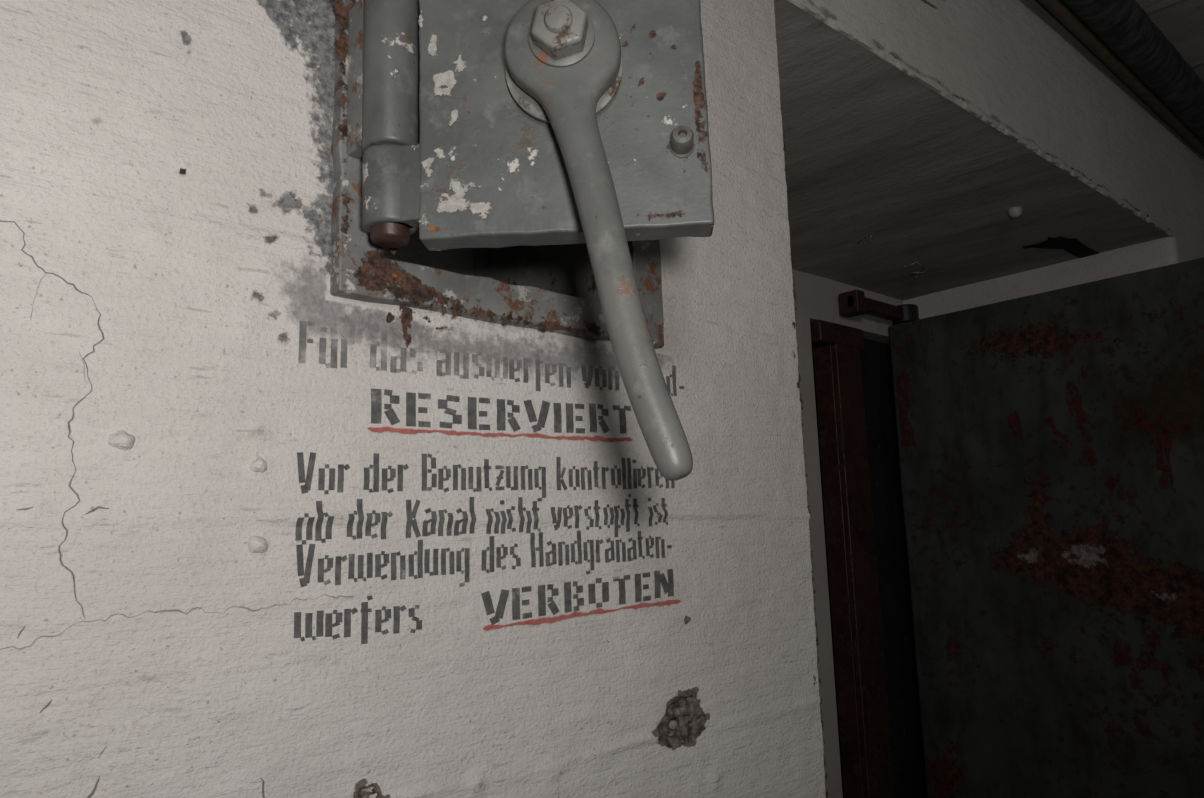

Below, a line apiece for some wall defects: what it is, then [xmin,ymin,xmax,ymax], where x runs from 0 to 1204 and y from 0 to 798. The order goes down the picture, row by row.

rust [332,0,356,139]
peeling [249,189,316,220]
rust [341,192,352,237]
crack [0,220,104,617]
spalling [652,687,710,750]
spalling [353,778,390,798]